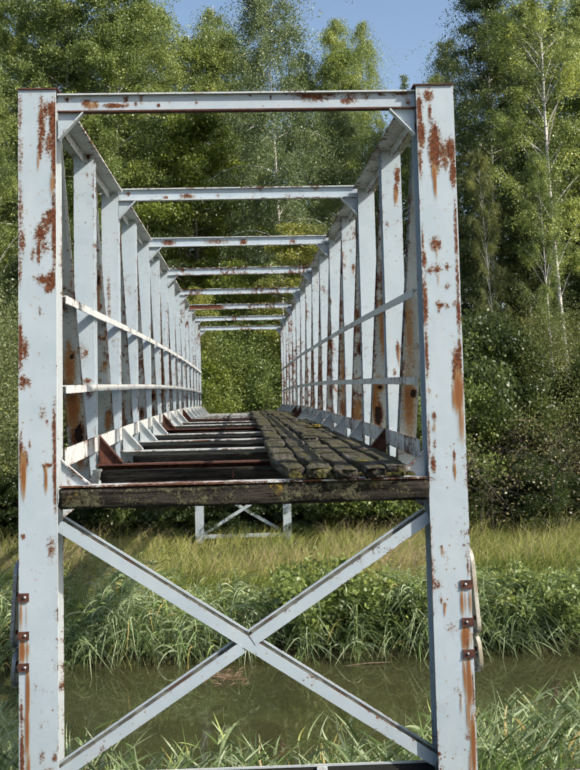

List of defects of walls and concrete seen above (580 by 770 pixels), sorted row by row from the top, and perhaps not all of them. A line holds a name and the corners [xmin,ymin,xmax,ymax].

corrosion [80,95,144,109]
corrosion [19,96,56,294]
corrosion [293,86,464,438]
corrosion [19,313,32,390]
corrosion [19,431,31,498]
corrosion [39,341,107,511]
corrosion [104,410,112,432]
corrosion [461,591,472,613]
corrosion [19,641,57,770]
corrosion [448,623,476,770]